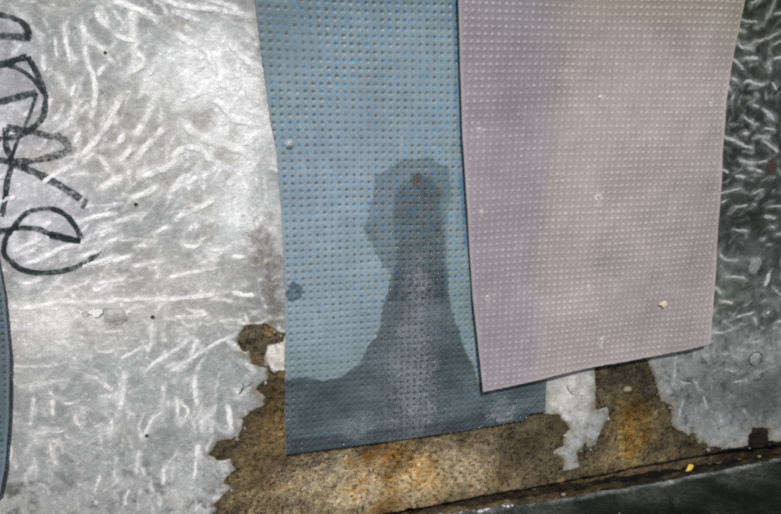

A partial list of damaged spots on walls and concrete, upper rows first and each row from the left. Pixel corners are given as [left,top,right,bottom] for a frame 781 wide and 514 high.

damp [286,282,302,302]
spalling [209,324,781,514]